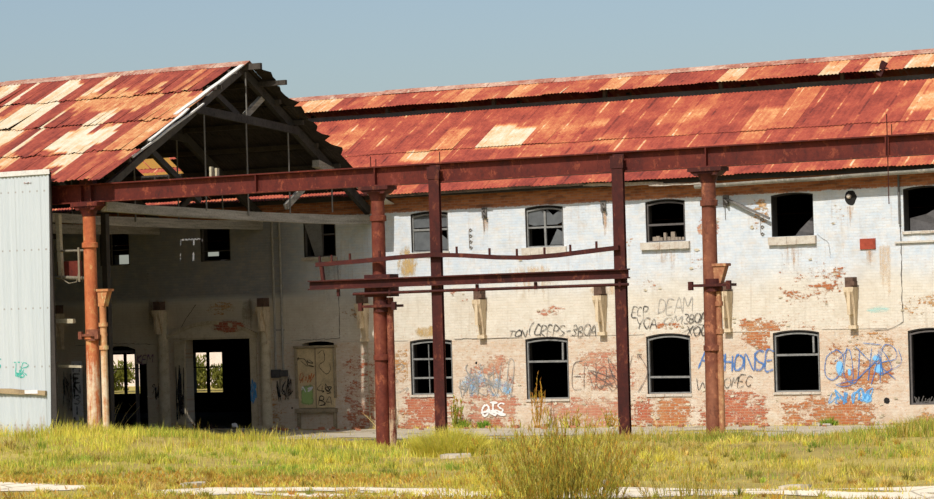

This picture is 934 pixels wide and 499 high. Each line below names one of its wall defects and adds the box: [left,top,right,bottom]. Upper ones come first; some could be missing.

peeling [777,258,845,304]
peeling [732,317,815,351]
peeling [343,352,376,429]
peeling [395,349,435,428]
peeling [447,352,526,428]
peeling [539,348,618,427]
peeling [630,369,706,426]
peeling [724,332,900,426]